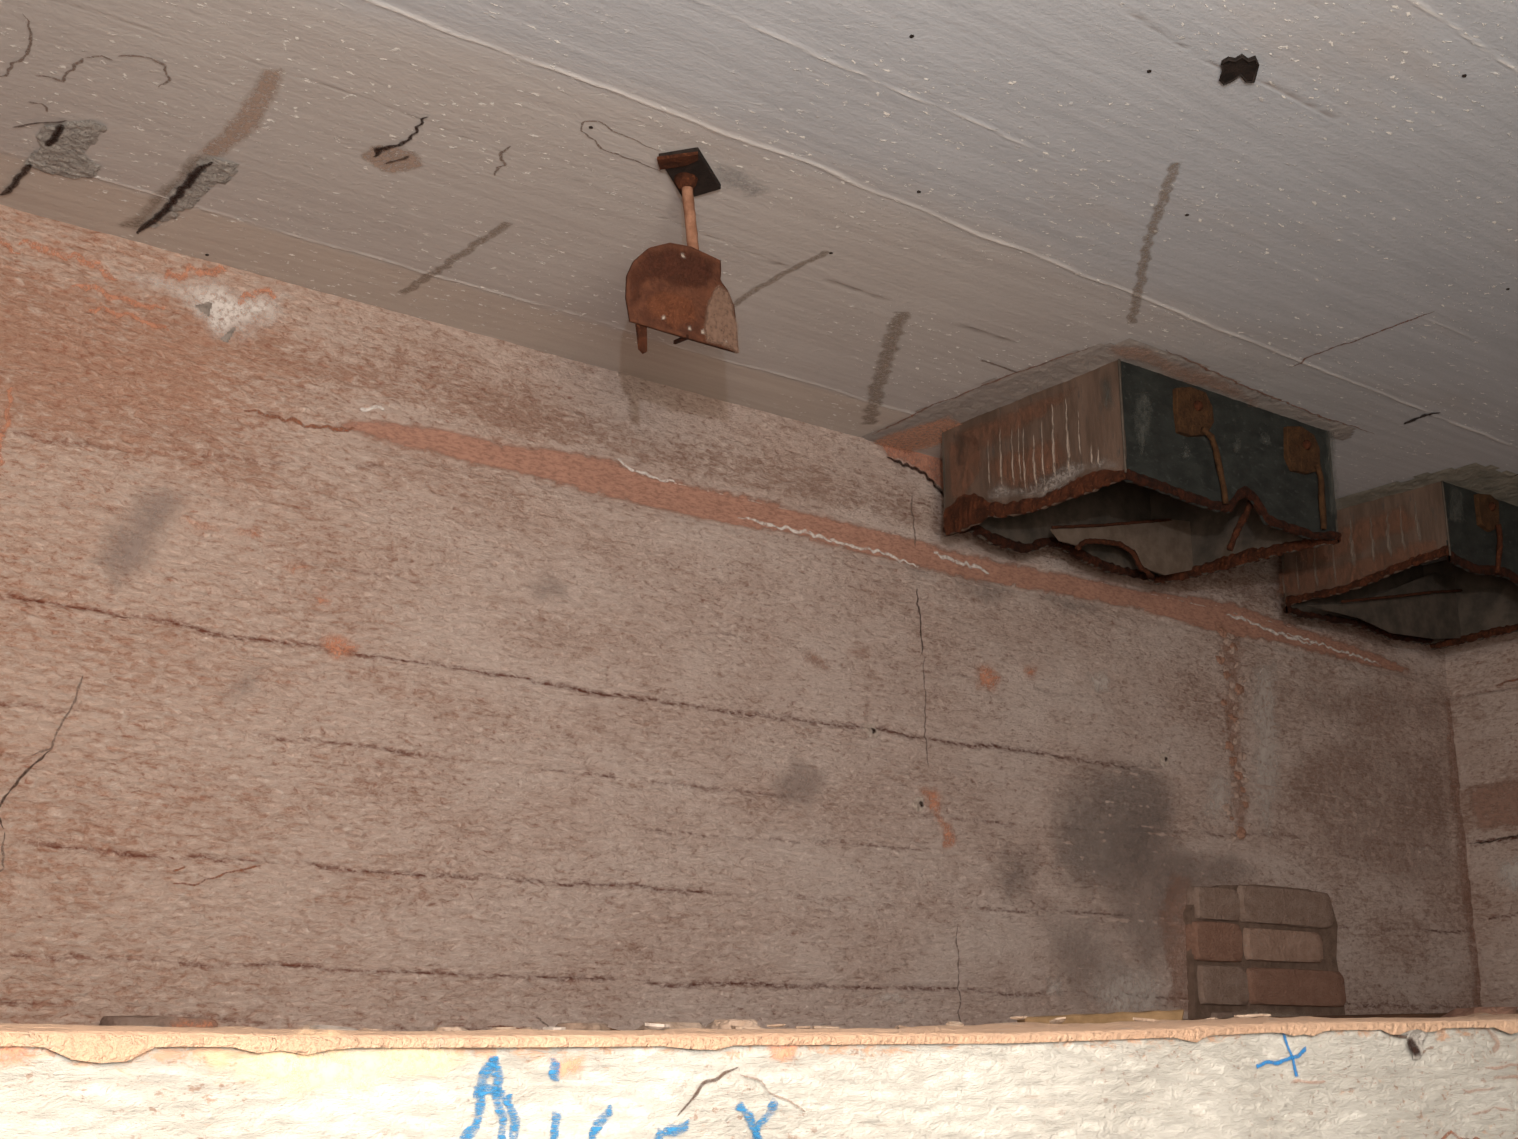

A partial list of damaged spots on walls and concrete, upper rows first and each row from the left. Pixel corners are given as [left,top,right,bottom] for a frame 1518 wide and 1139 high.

crack [0,19,171,85]
spalling [0,102,107,195]
spalling [363,117,428,172]
spalling [136,157,240,234]
crack [0,677,83,872]